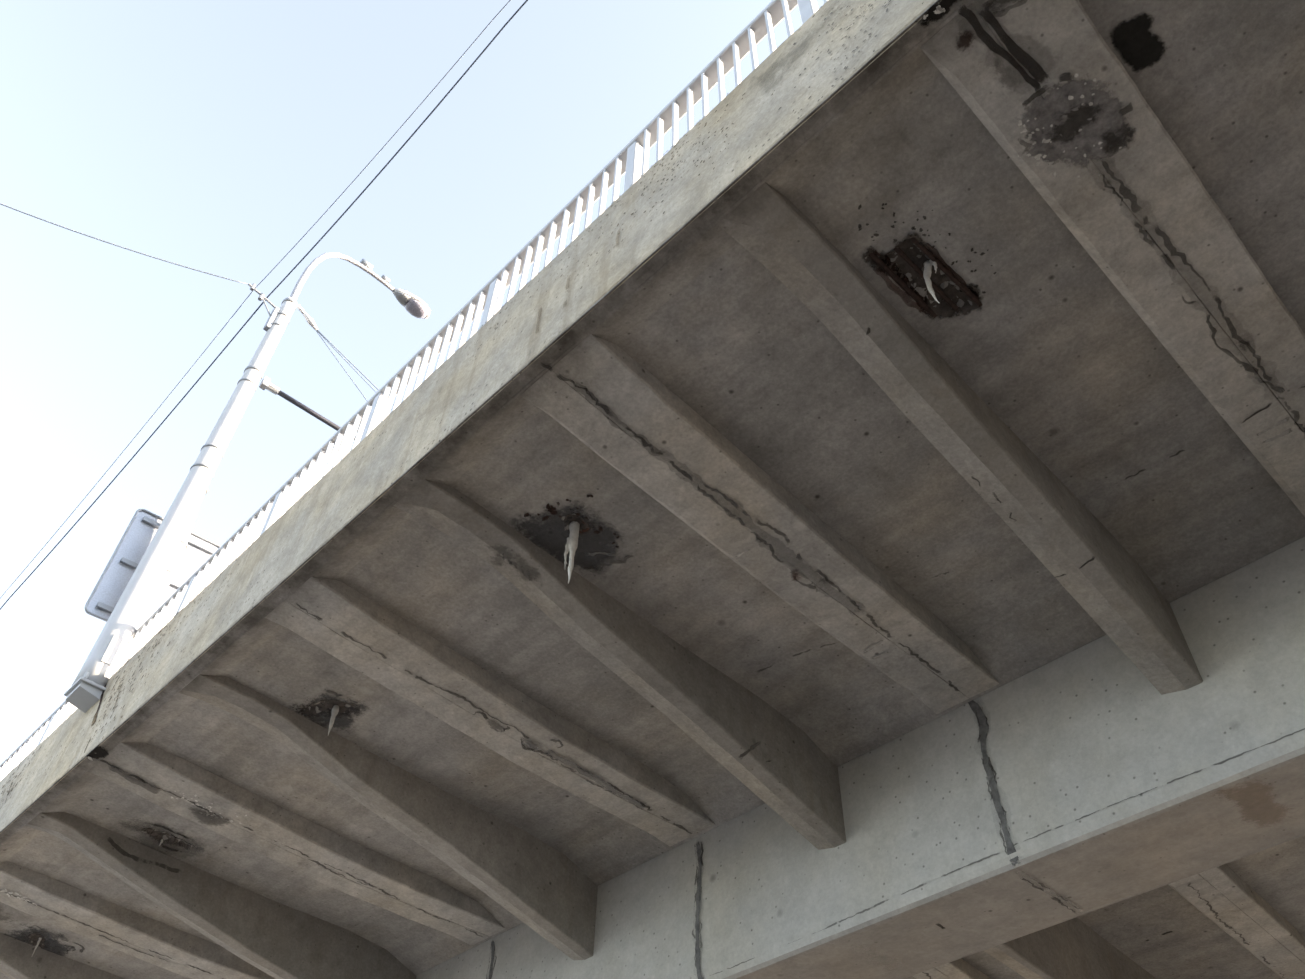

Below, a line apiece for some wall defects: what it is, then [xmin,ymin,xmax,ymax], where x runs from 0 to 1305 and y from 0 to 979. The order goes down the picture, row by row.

damp [1111,13,1165,72]
spalling [858,203,996,319]
spalling [512,495,619,572]
crack [542,364,1305,944]
spalling [293,694,364,730]
spalling [144,824,194,851]
crack [84,683,495,979]
crack [297,604,754,979]
crack [0,889,211,974]